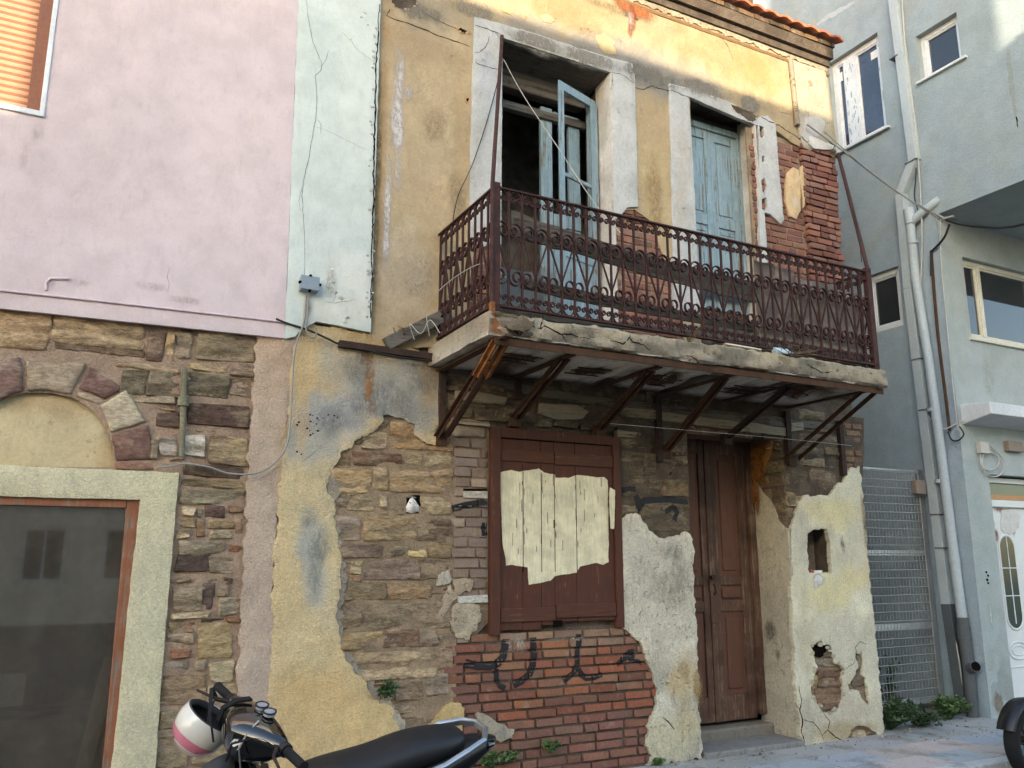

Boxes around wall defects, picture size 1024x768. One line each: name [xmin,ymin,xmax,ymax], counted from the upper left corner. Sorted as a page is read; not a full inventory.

crack [386,9,501,69]
rust [617,1,652,33]
crack [299,2,372,275]
spalling [731,103,846,358]
crack [501,315,650,350]
spalling [330,367,868,768]
crack [795,688,841,741]